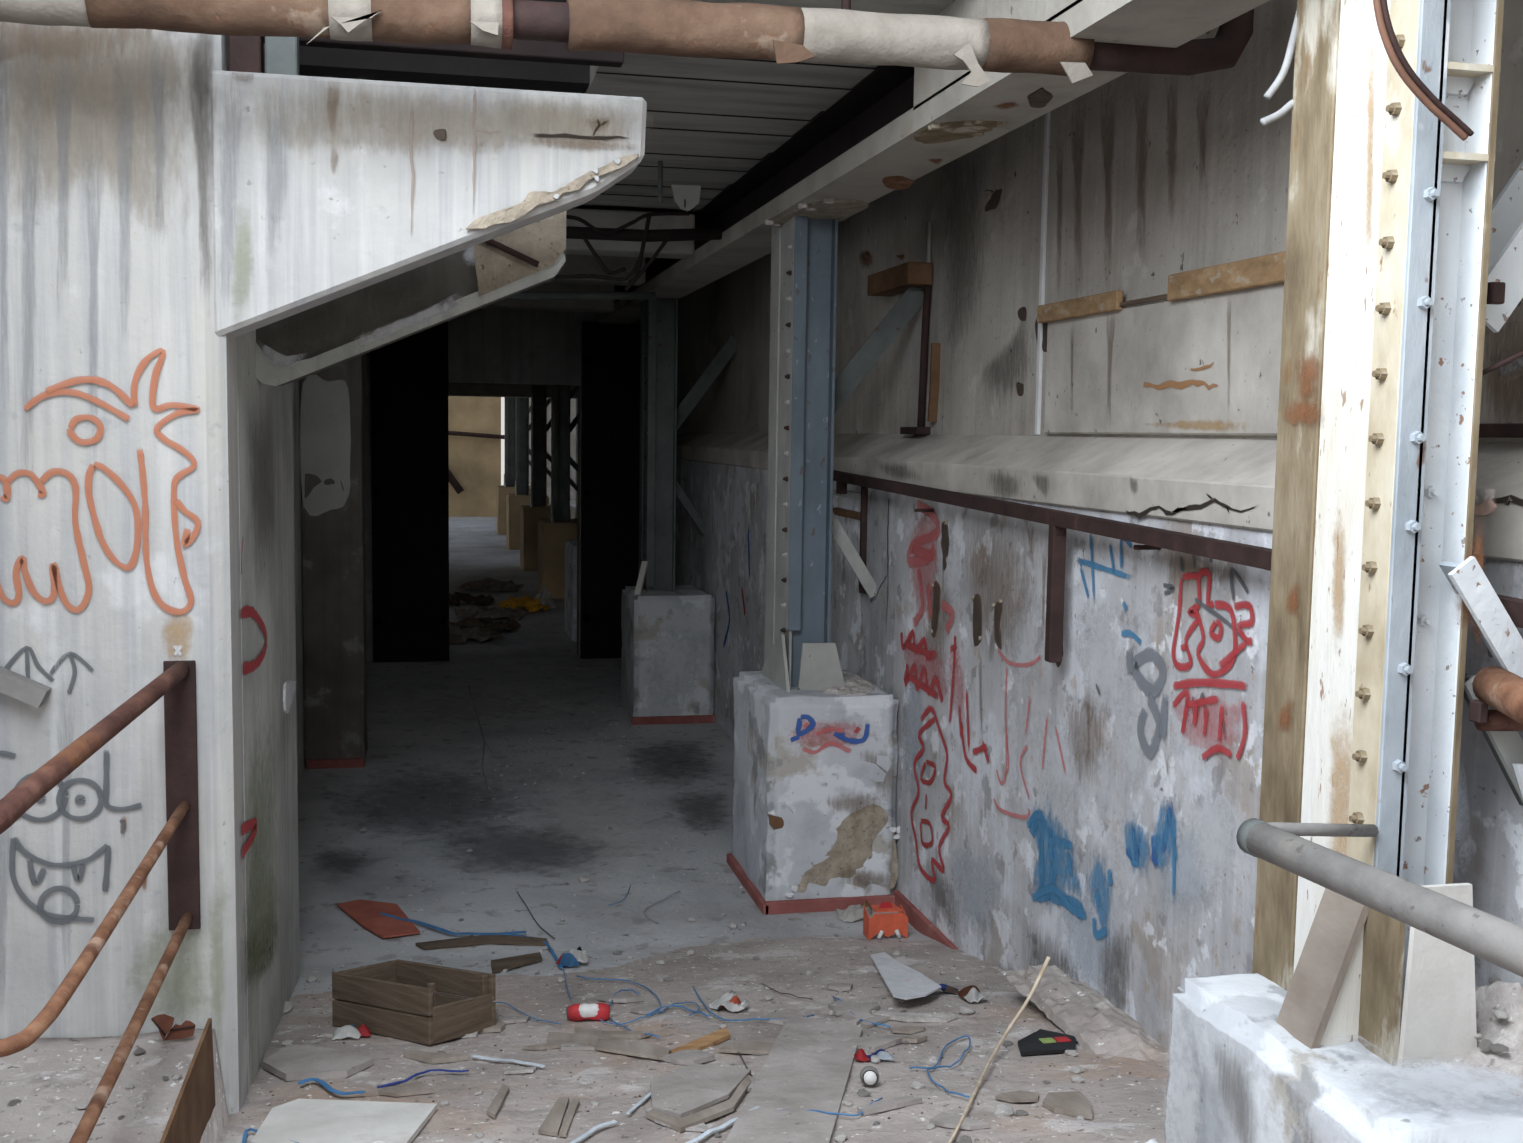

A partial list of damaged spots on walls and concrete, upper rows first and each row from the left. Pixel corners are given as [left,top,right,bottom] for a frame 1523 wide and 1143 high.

spalling [464,154,639,259]
peeling [363,304,449,342]
peeling [263,346,301,365]
corrosion [1287,356,1318,424]
crack [1126,494,1256,517]
crack [1494,495,1523,506]
peeling [785,804,900,898]